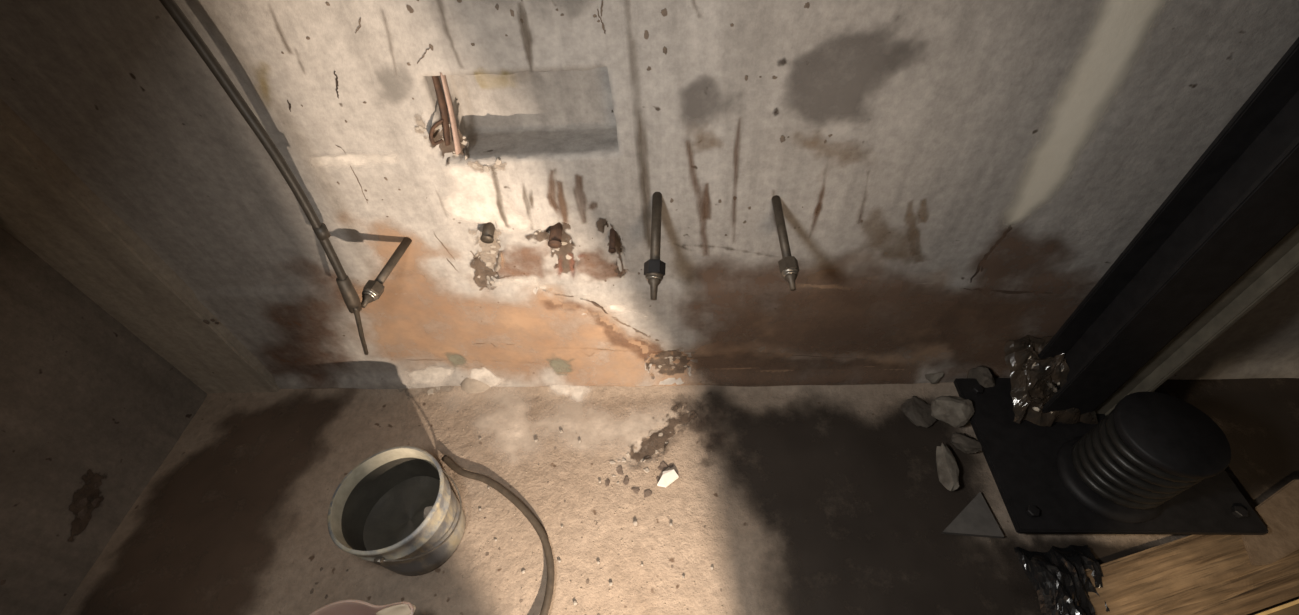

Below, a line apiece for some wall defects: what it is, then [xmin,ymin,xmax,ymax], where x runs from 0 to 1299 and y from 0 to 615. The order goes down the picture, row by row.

leakage [683,79,718,122]
leakage [779,34,907,122]
rust [265,275,343,381]
spalling [453,218,642,303]
rust [353,226,1012,387]
leakage [409,355,664,453]
spalling [605,406,697,498]